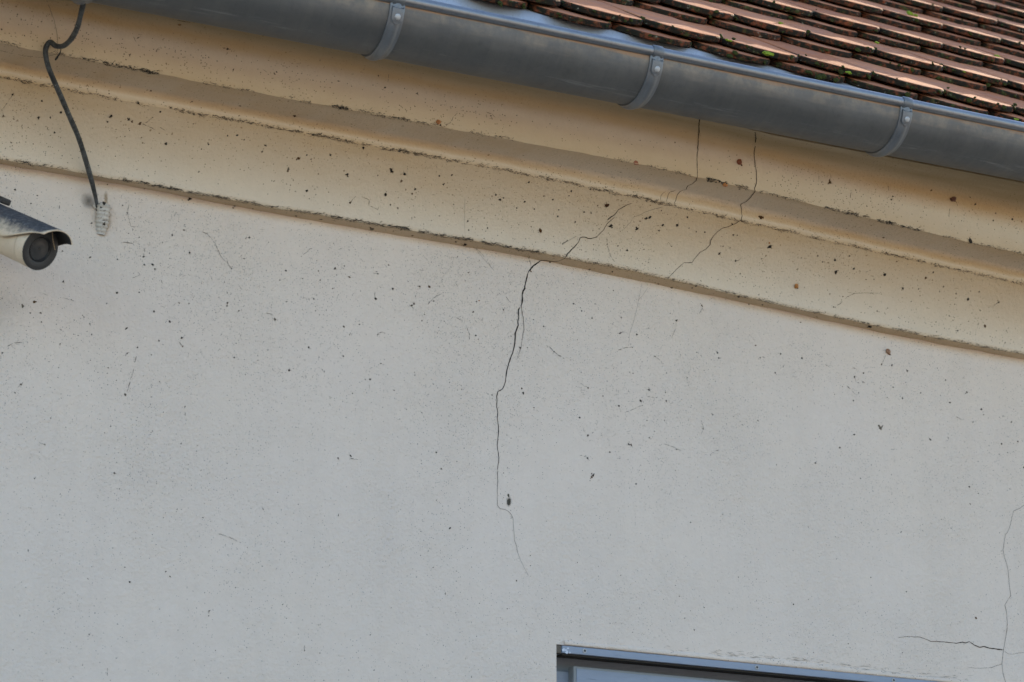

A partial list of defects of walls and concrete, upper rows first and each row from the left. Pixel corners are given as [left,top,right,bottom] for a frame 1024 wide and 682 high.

crack [670,133,757,276]
crack [496,119,700,567]
crack [673,505,1024,682]